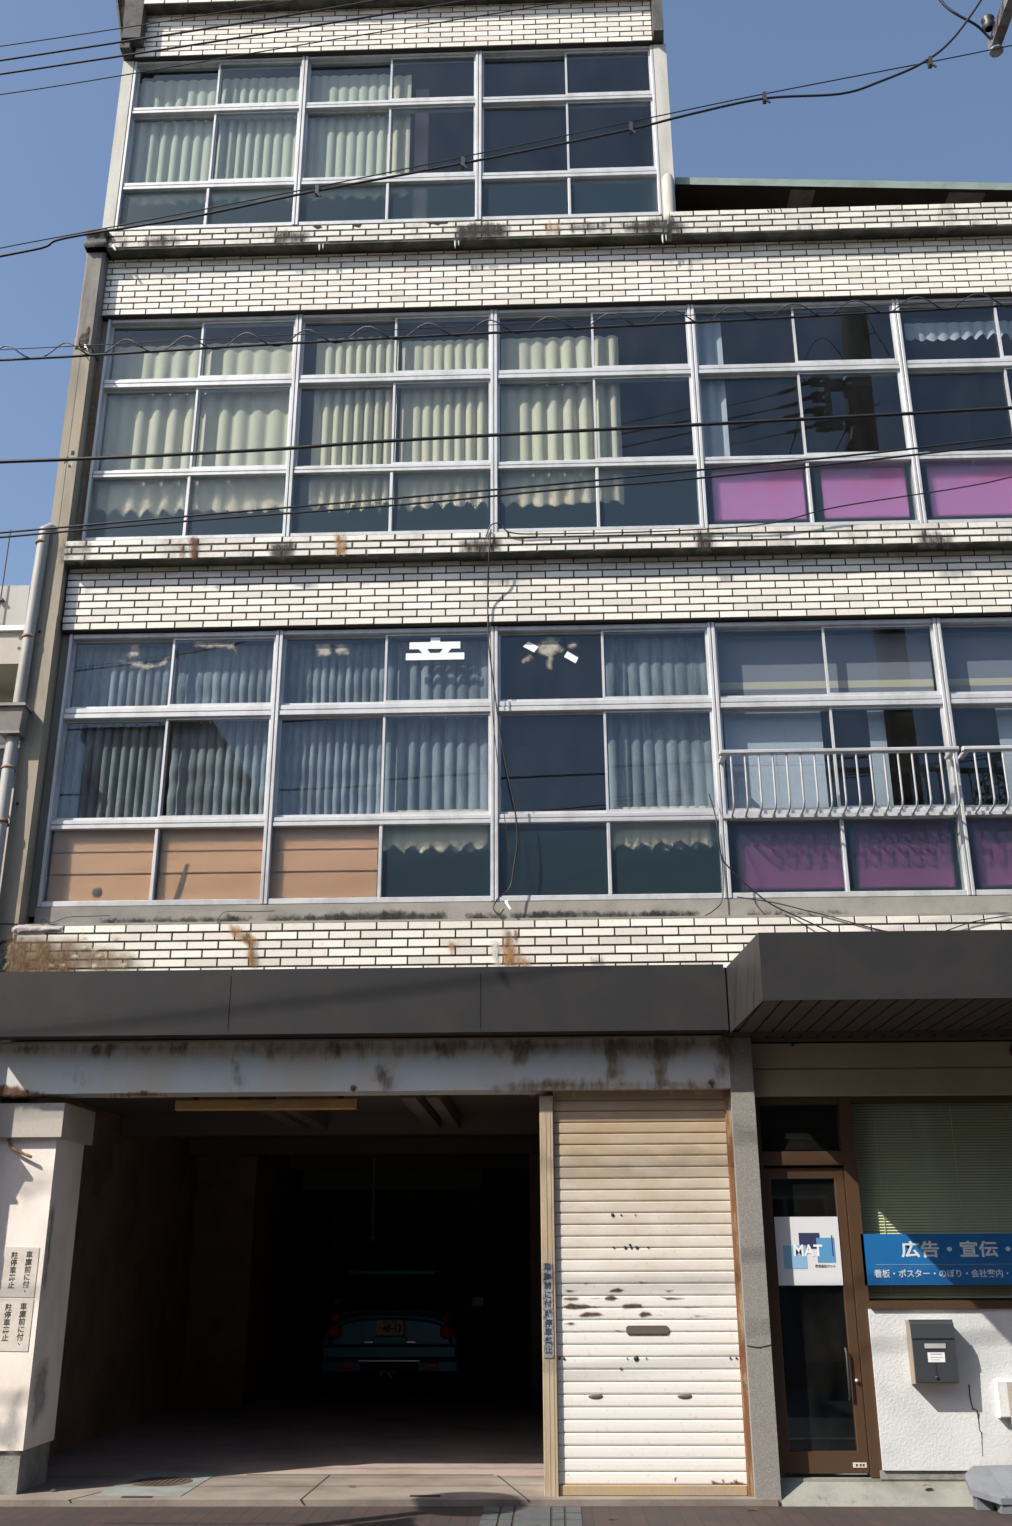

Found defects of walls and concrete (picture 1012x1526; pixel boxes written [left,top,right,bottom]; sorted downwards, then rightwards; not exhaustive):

leakage [457,221,508,240]
leakage [624,216,685,241]
rust [179,537,197,558]
rust [230,927,256,963]
rust [503,931,528,966]
rust [0,1085,44,1097]